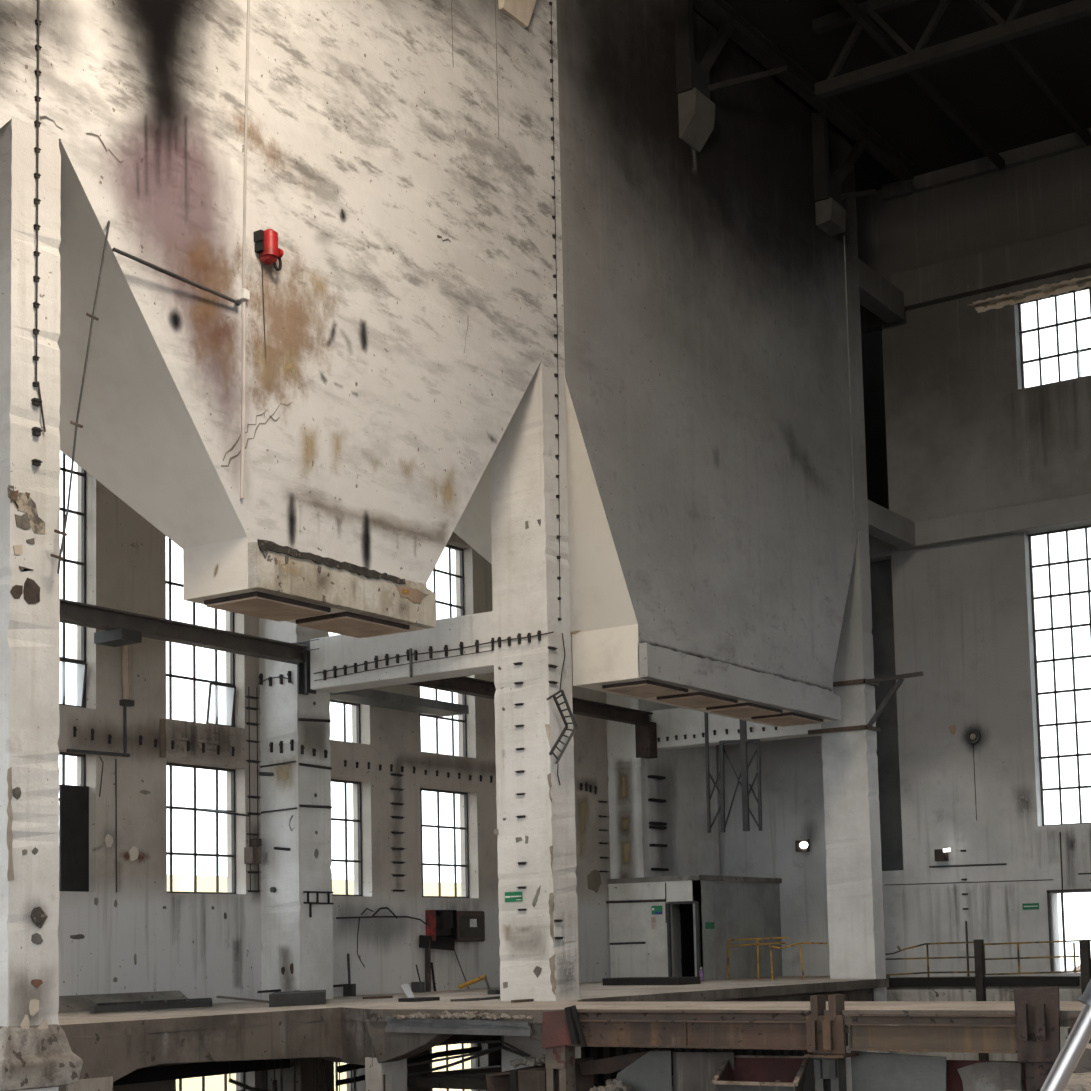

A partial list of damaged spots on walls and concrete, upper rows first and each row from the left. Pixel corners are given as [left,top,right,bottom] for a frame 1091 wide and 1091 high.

corrosion [254,268,312,392]
crack [221,402,292,467]
spalling [7,487,45,604]
spalling [257,539,429,604]